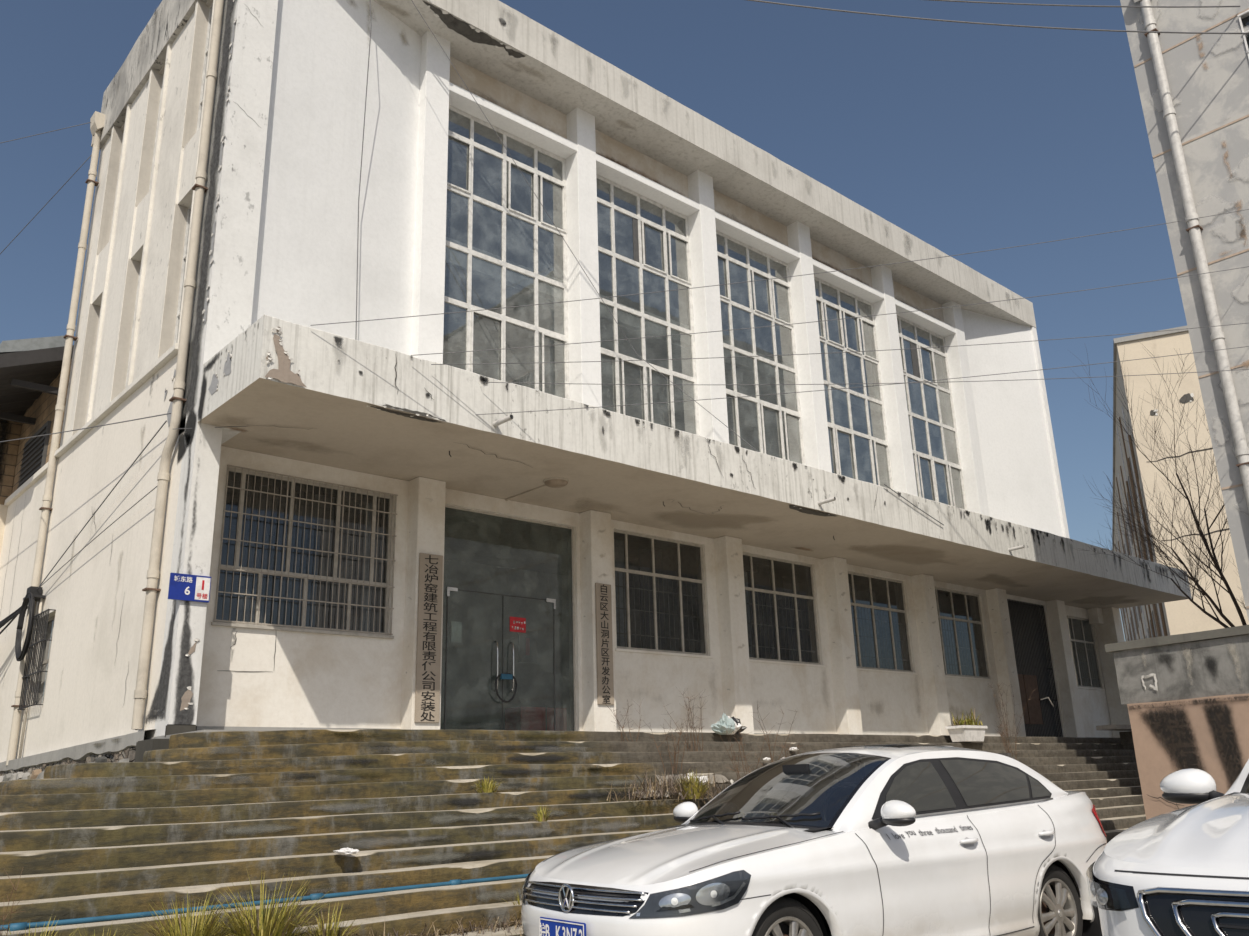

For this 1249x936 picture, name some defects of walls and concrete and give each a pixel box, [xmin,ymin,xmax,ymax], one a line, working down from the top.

peeling [1199,0,1221,17]
peeling [1197,27,1249,68]
peeling [1151,90,1180,112]
peeling [1195,196,1247,255]
peeling [208,350,232,395]
peeling [265,327,306,387]
peeling [1219,360,1249,404]
peeling [1213,418,1249,454]
water stain [960,510,1016,539]
water stain [145,600,194,725]
water stain [1129,696,1248,785]